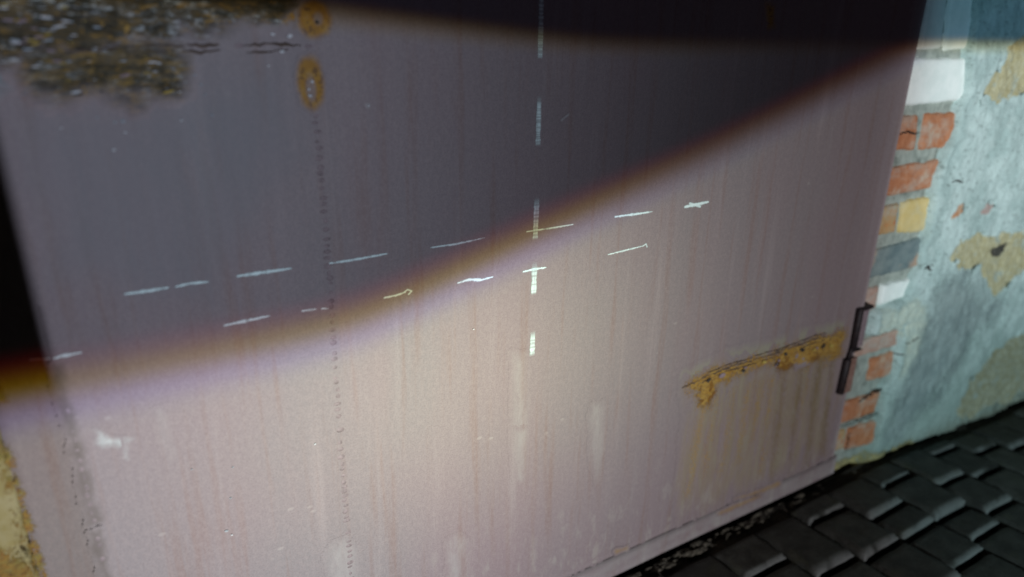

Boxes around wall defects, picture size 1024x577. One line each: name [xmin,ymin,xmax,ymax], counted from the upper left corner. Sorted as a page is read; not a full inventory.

peeling [0,3,107,68]
rust [0,0,335,120]
flaking render [980,35,1024,106]
flaking render [951,203,967,219]
flaking render [950,230,1024,297]
rust [670,315,853,528]